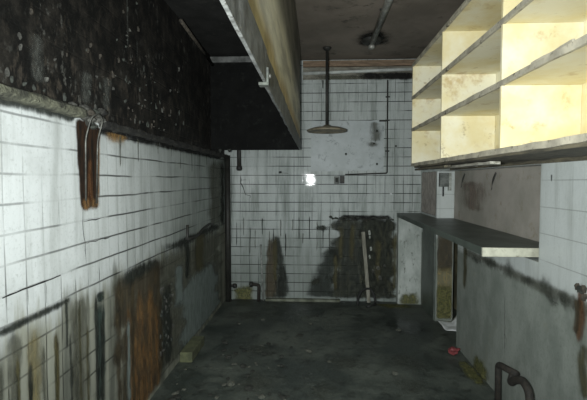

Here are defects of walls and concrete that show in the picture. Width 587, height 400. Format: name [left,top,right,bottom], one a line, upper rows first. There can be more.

corrosion [76,120,100,210]
damp [0,292,105,400]
corrosion [113,261,163,400]
damp [236,219,288,298]
damp [309,215,397,299]
damp [463,247,577,308]
corrosion [574,283,587,340]
corrosion [578,346,587,397]